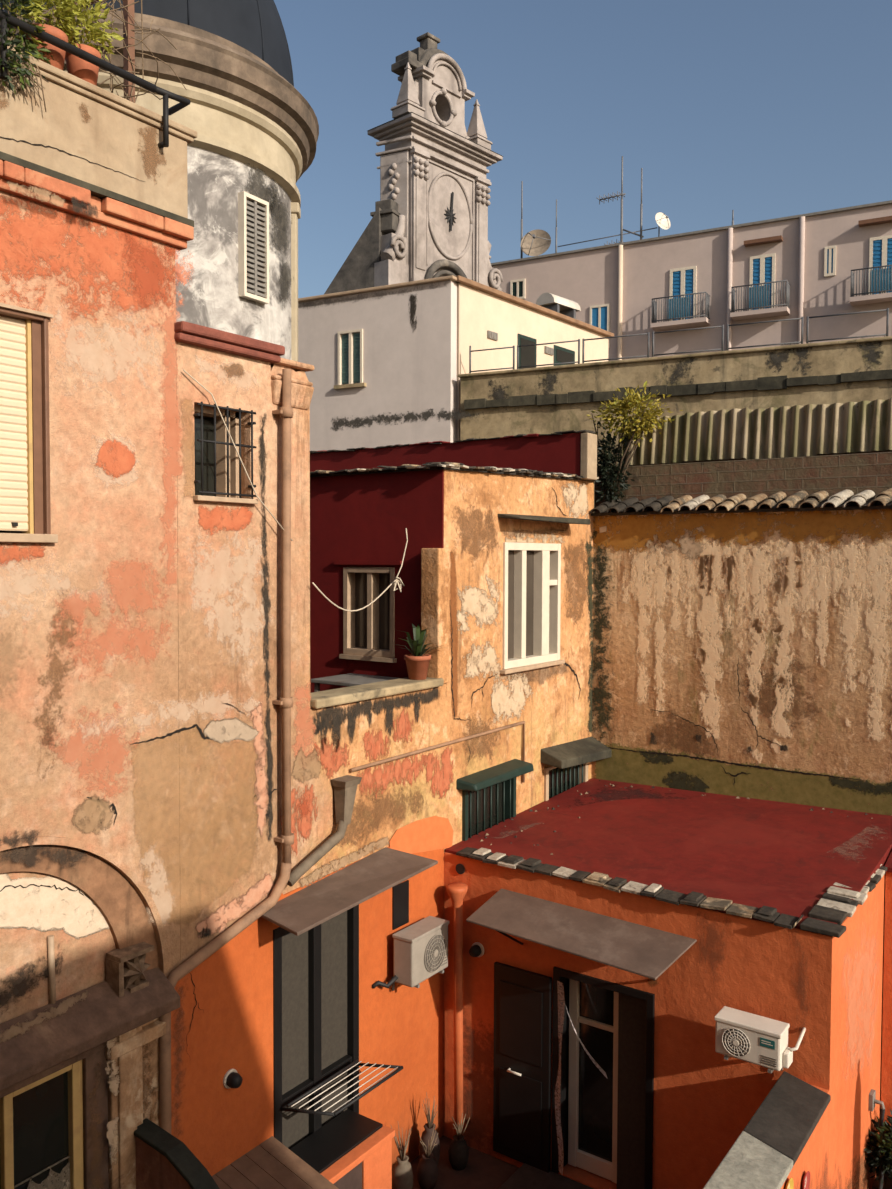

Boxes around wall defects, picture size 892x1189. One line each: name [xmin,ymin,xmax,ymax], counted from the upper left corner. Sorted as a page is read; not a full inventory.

damp [245,163,294,308]
damp [539,373,558,395]
damp [766,342,812,375]
damp [857,336,885,371]
damp [331,408,484,431]
flaking render [457,575,533,724]
flaking render [621,526,892,768]
crack [130,724,213,745]
damp [312,687,438,753]
spalling [72,796,114,834]
flaking render [0,873,110,939]
flaking render [0,991,88,1043]